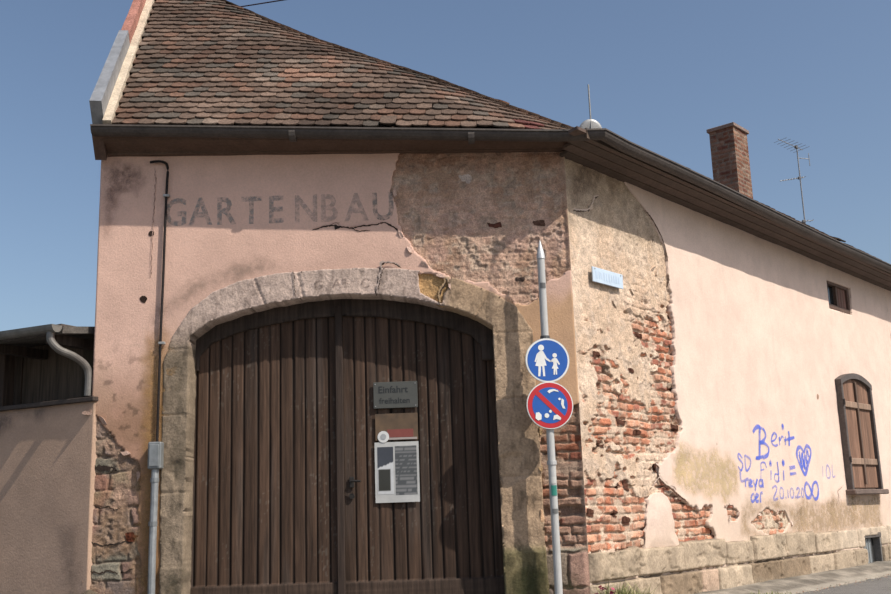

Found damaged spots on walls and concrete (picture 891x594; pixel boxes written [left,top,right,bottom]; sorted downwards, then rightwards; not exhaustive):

crack [573,195,599,212]
crack [312,221,399,232]
flaking render [390,152,714,594]
damp [675,447,737,499]
flaking render [81,411,145,594]
flaking render [724,505,740,524]
flaking render [751,508,793,535]